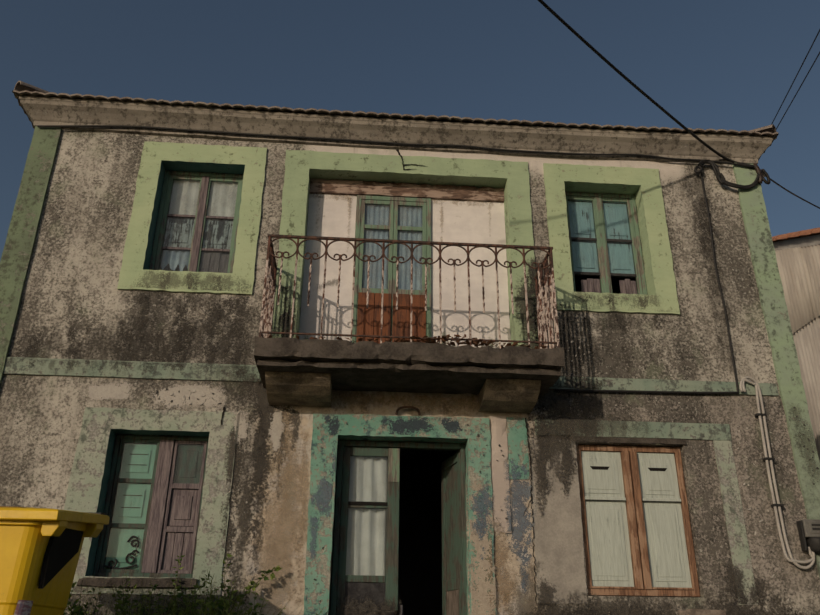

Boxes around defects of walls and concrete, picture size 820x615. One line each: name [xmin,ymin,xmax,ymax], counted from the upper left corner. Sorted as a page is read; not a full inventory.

crack [393,141,428,170]
leakage [515,258,544,349]
leakage [221,372,301,605]
peeling [309,415,348,560]
peeling [381,416,469,435]
peeling [466,444,535,615]
leakage [528,304,605,516]
leakage [532,564,801,615]